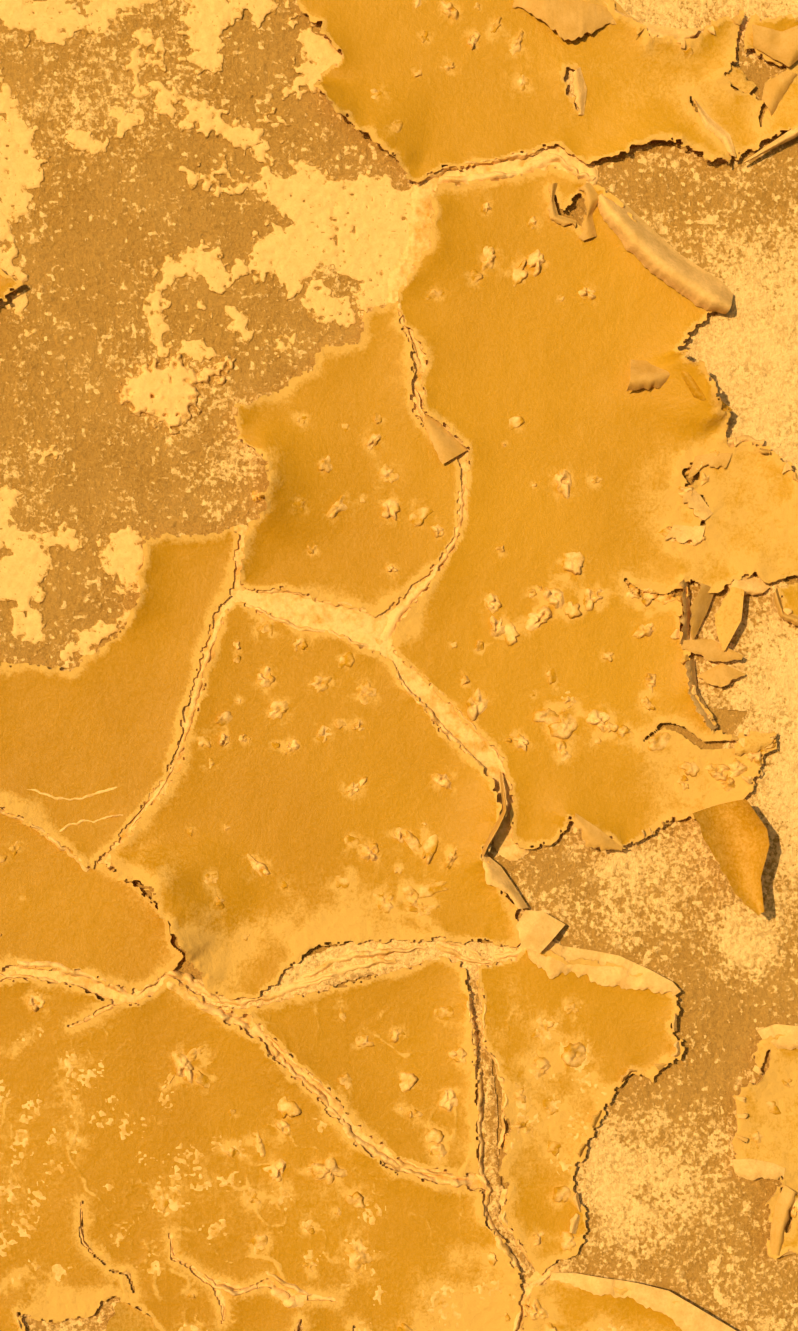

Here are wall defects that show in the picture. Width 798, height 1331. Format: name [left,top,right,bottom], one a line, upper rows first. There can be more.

peeling [0,0,414,671]
peeling [467,0,798,546]
crack [0,144,599,872]
peeling [377,464,444,538]
peeling [562,552,585,575]
peeling [475,572,798,1331]
peeling [60,1049,104,1090]
peeling [89,1046,294,1217]
crack [0,936,560,1331]
peeling [275,1096,327,1138]
peeling [396,1072,423,1118]
peeling [302,1220,388,1306]